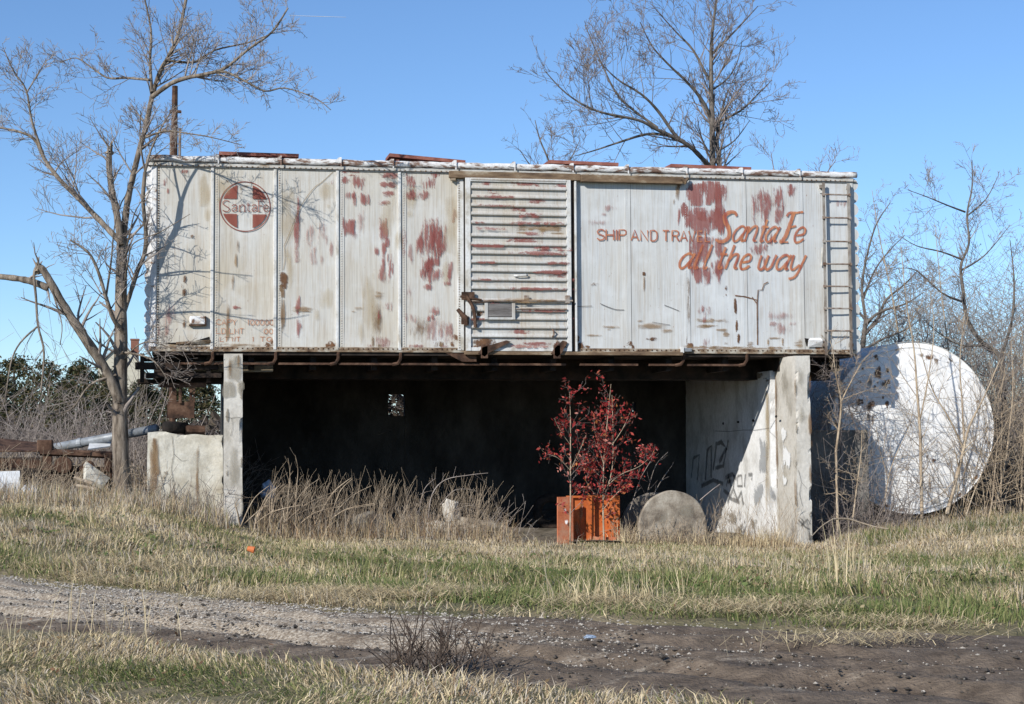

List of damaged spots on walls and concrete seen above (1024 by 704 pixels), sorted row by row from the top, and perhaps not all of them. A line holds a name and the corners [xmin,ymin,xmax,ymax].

peeling [342,171,439,206]
peeling [343,217,355,238]
peeling [375,219,393,283]
peeling [416,218,453,290]
peeling [471,182,575,291]
peeling [677,181,727,287]
peeling [750,184,795,263]
rust [279,272,310,327]
rust [471,338,495,347]
peeling [509,329,558,348]